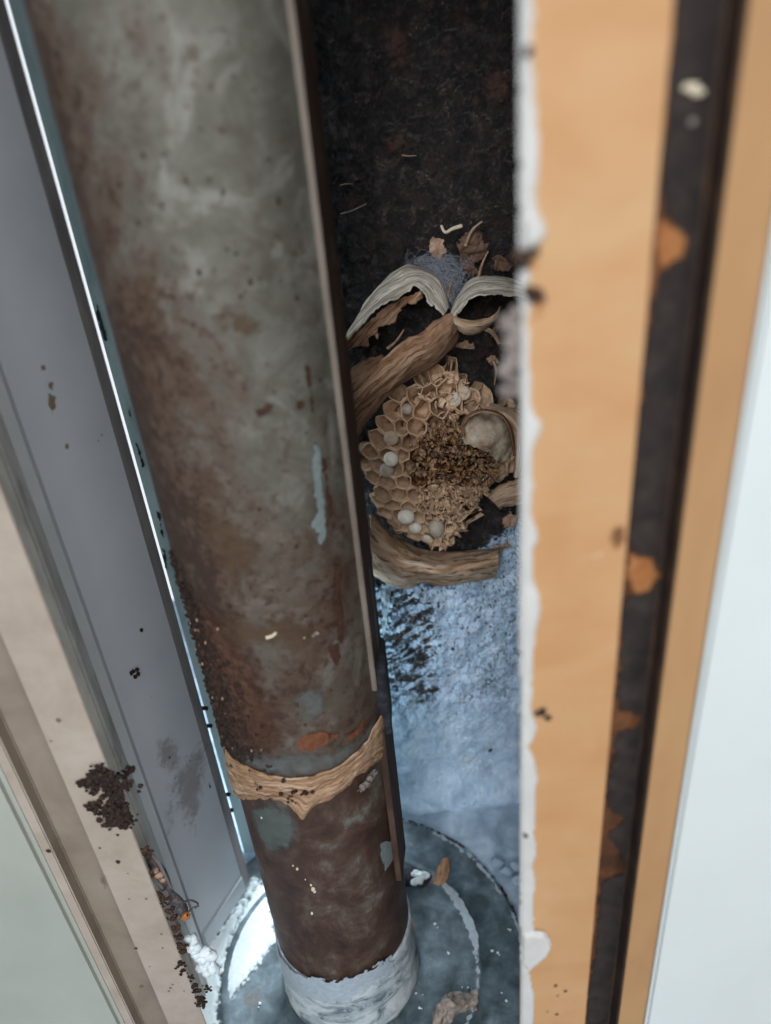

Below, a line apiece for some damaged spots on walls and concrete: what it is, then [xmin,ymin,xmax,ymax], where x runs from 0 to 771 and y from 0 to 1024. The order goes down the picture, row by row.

rust [255,404,273,417]
rust [297,365,314,413]
peeling [311,444,326,545]
rust [321,458,334,516]
rust [223,616,316,643]
rust [297,717,366,751]